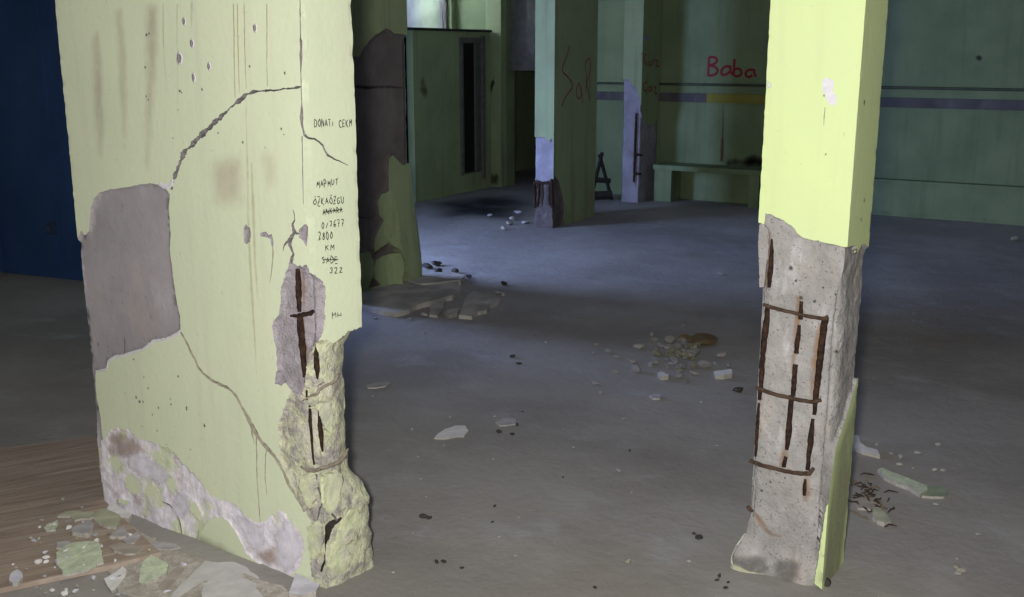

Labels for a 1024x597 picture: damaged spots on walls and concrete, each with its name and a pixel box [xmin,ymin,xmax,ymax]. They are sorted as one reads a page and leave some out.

spalling [731,213,868,590]